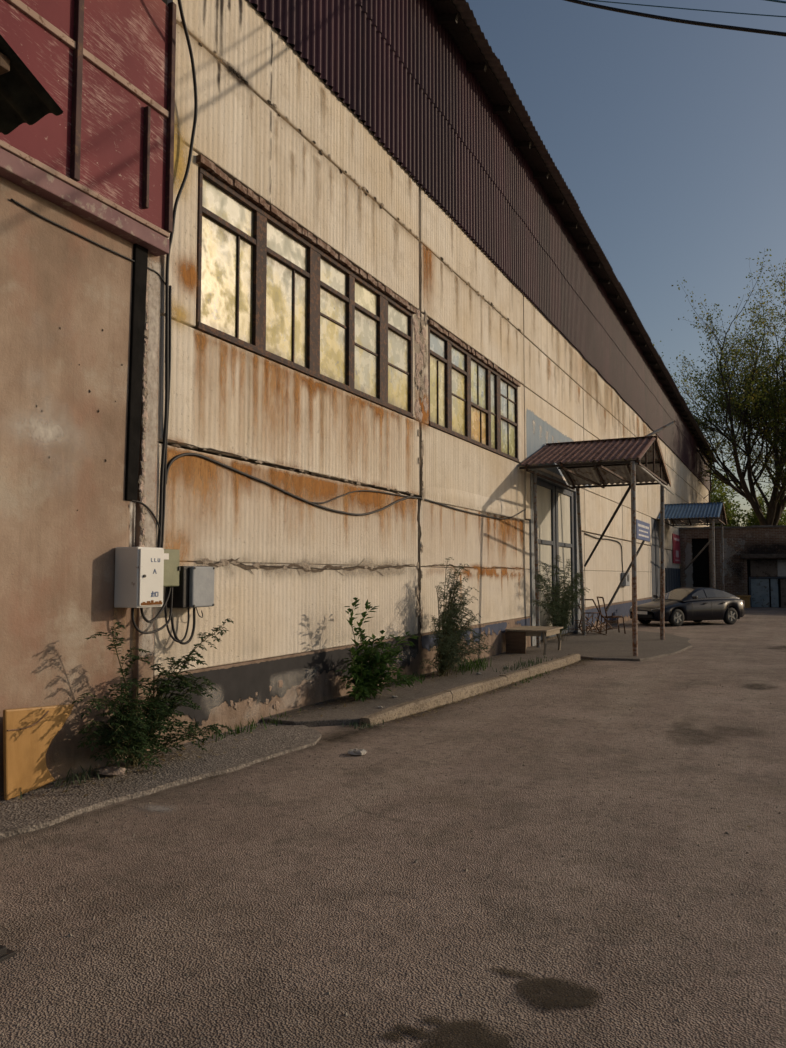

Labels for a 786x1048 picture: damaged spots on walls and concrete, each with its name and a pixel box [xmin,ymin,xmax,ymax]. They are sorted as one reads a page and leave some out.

water stain [204,0,249,89]
rust [180,262,197,291]
rust [221,346,336,424]
rust [406,395,429,453]
rust [167,449,218,504]
rust [232,462,416,525]
crack [196,424,523,641]
rust [460,565,524,582]
peeling [460,618,530,647]
peeling [157,634,450,726]
water stain [495,968,600,1008]
water stain [430,1020,512,1048]